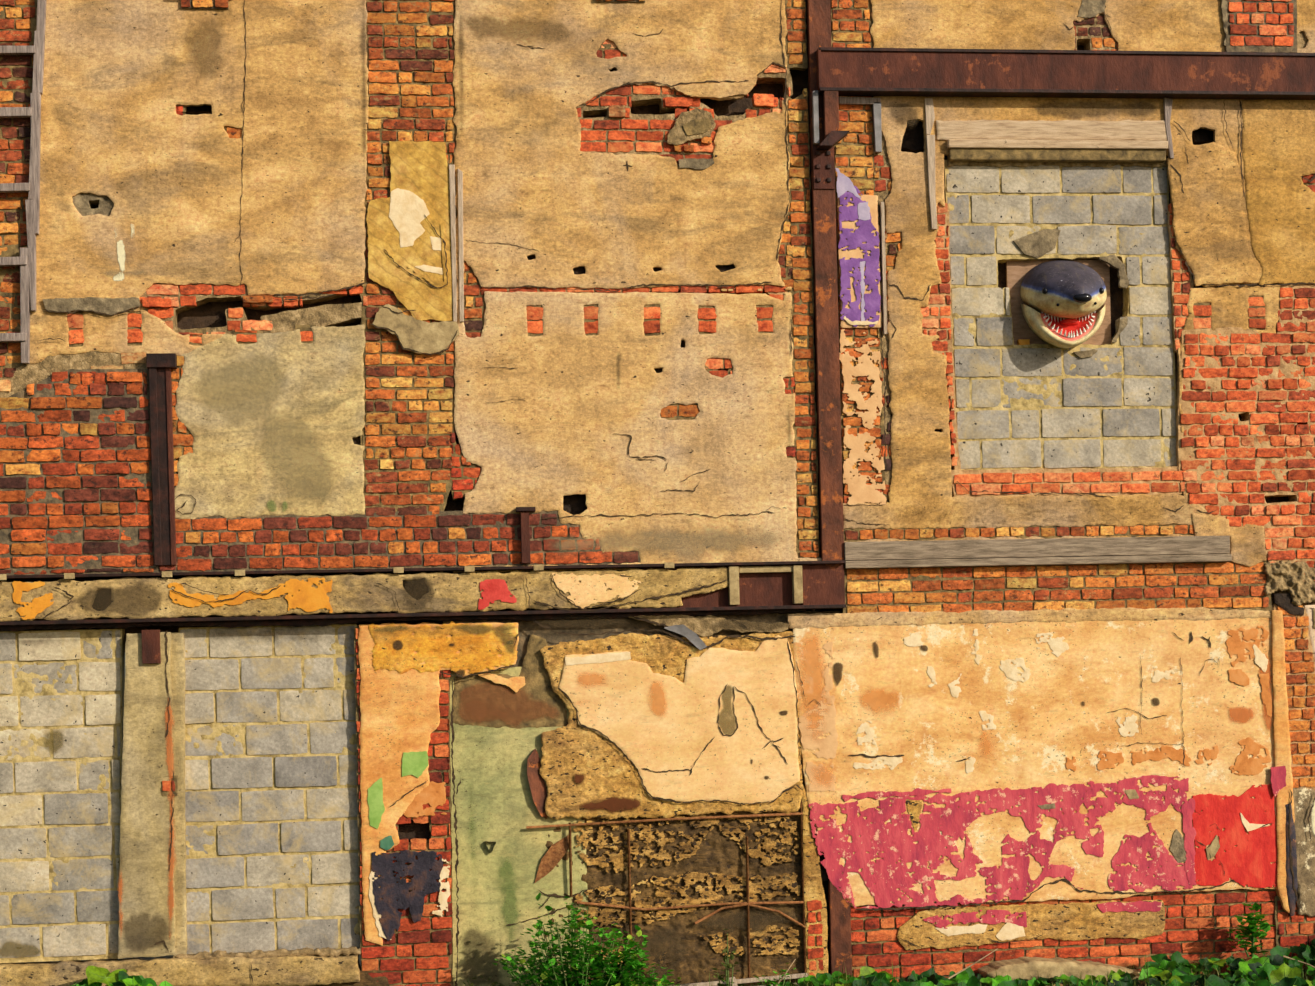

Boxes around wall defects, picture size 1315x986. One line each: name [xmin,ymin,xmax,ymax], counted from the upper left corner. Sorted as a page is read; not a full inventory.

flaking render [0,283,368,487]
crack [235,0,247,287]
leakage [201,359,330,496]
crack [274,215,538,355]
crack [479,0,791,292]
crack [540,434,780,520]
flaking render [576,64,793,166]
peeling [835,135,902,505]
flaking render [1167,204,1315,581]
peeling [367,778,450,941]
crack [390,574,820,986]
peeling [534,641,1315,941]